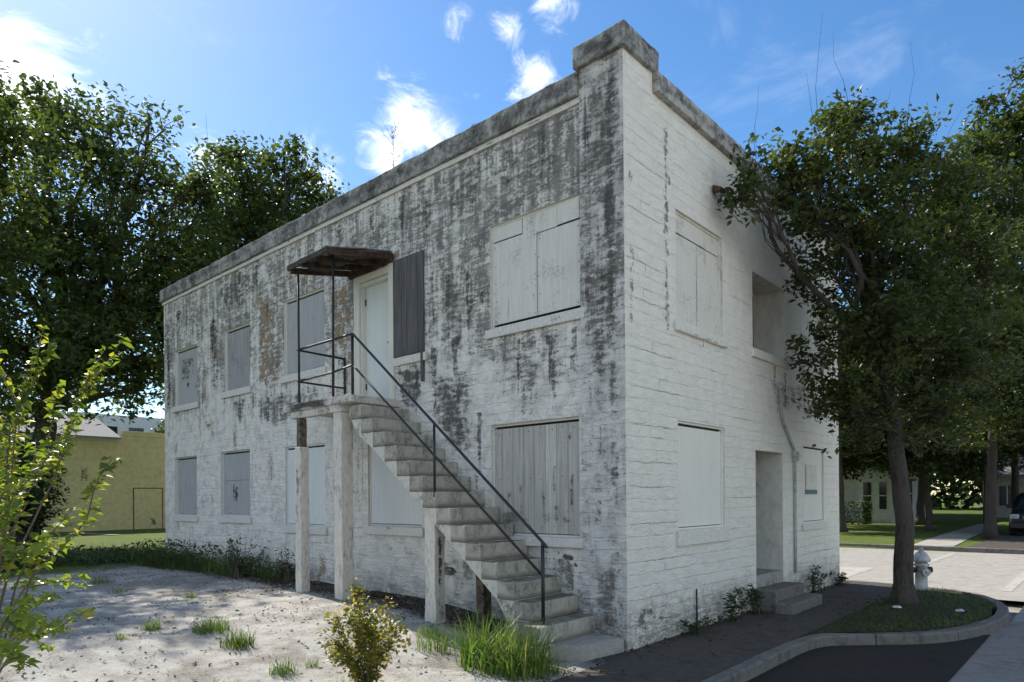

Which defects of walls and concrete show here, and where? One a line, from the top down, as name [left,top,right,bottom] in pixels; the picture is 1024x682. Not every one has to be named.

leakage [472,84,565,136]
leakage [398,191,431,242]
leakage [450,160,479,222]
leakage [508,77,616,399]
leakage [210,317,218,387]
peeling [258,294,277,388]
peeling [331,286,351,365]
leakage [399,272,483,408]